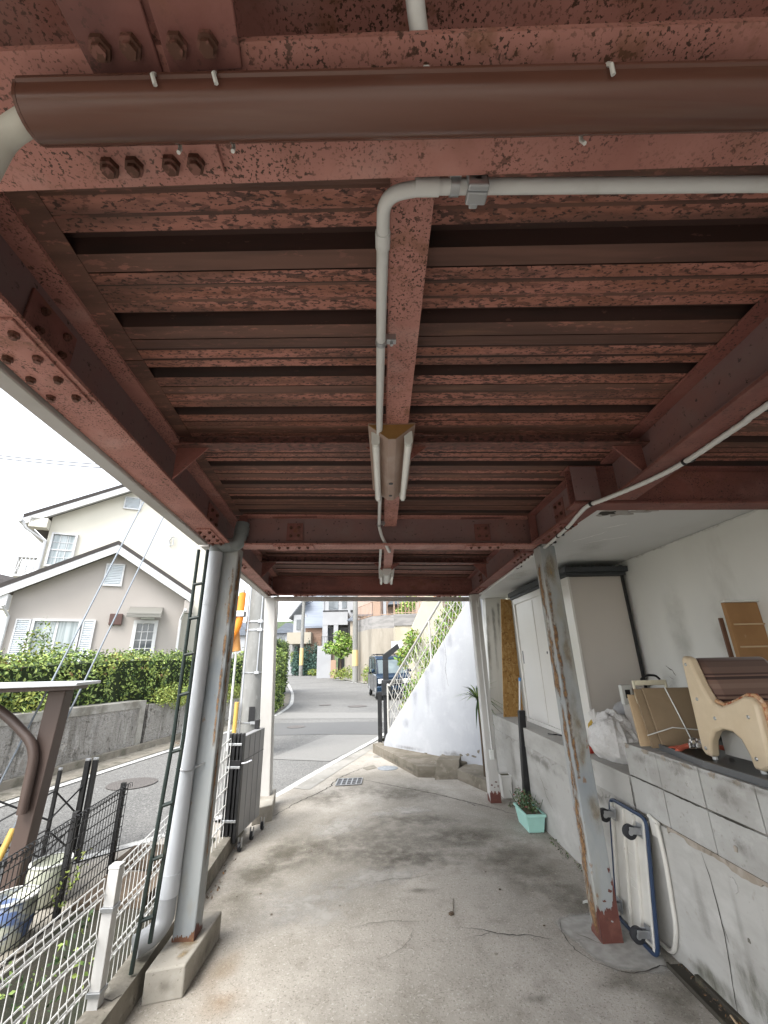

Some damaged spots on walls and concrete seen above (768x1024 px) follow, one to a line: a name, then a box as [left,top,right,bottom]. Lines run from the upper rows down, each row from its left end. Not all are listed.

corrosion [206,557,240,859]
corrosion [538,560,598,931]
corrosion [171,923,203,957]
crack [474,923,668,973]
crack [705,864,738,1012]